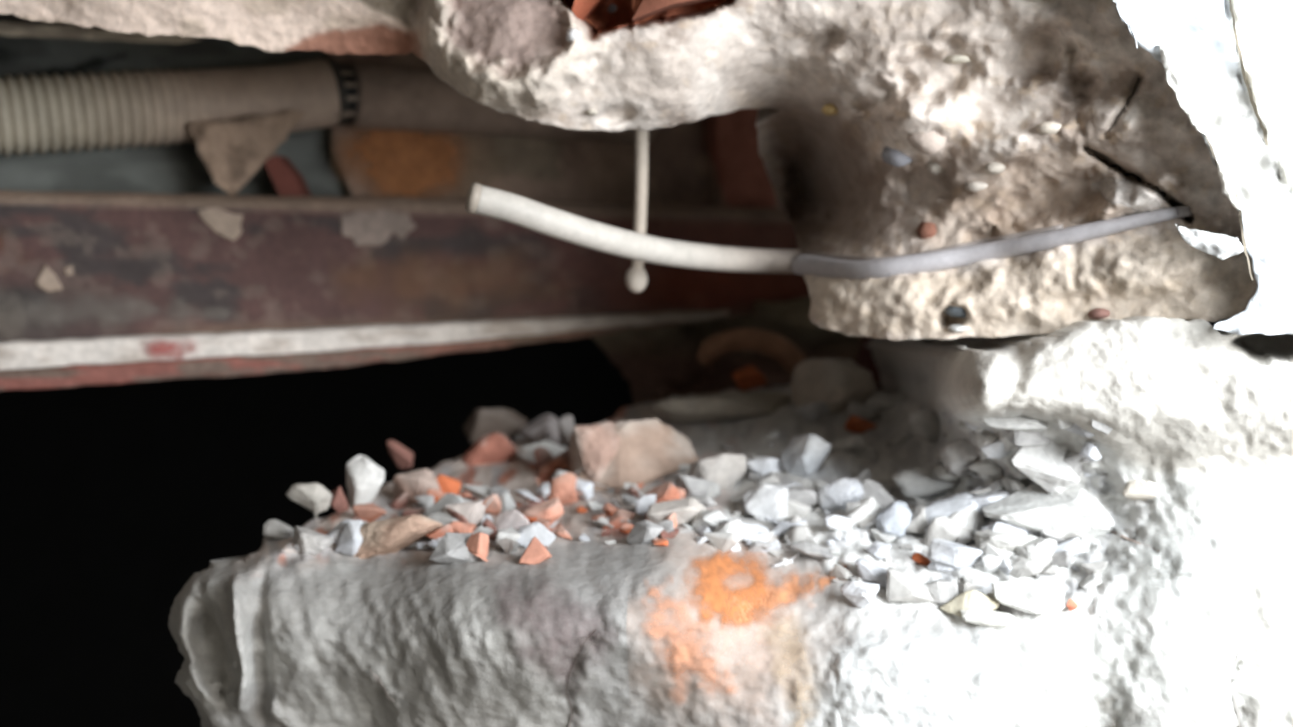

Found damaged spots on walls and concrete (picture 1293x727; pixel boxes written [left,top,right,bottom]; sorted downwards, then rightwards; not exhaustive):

spalling [0,0,1258,341]
corrosion [651,268,802,308]
crack [1087,0,1188,220]
crack [1205,136,1253,280]